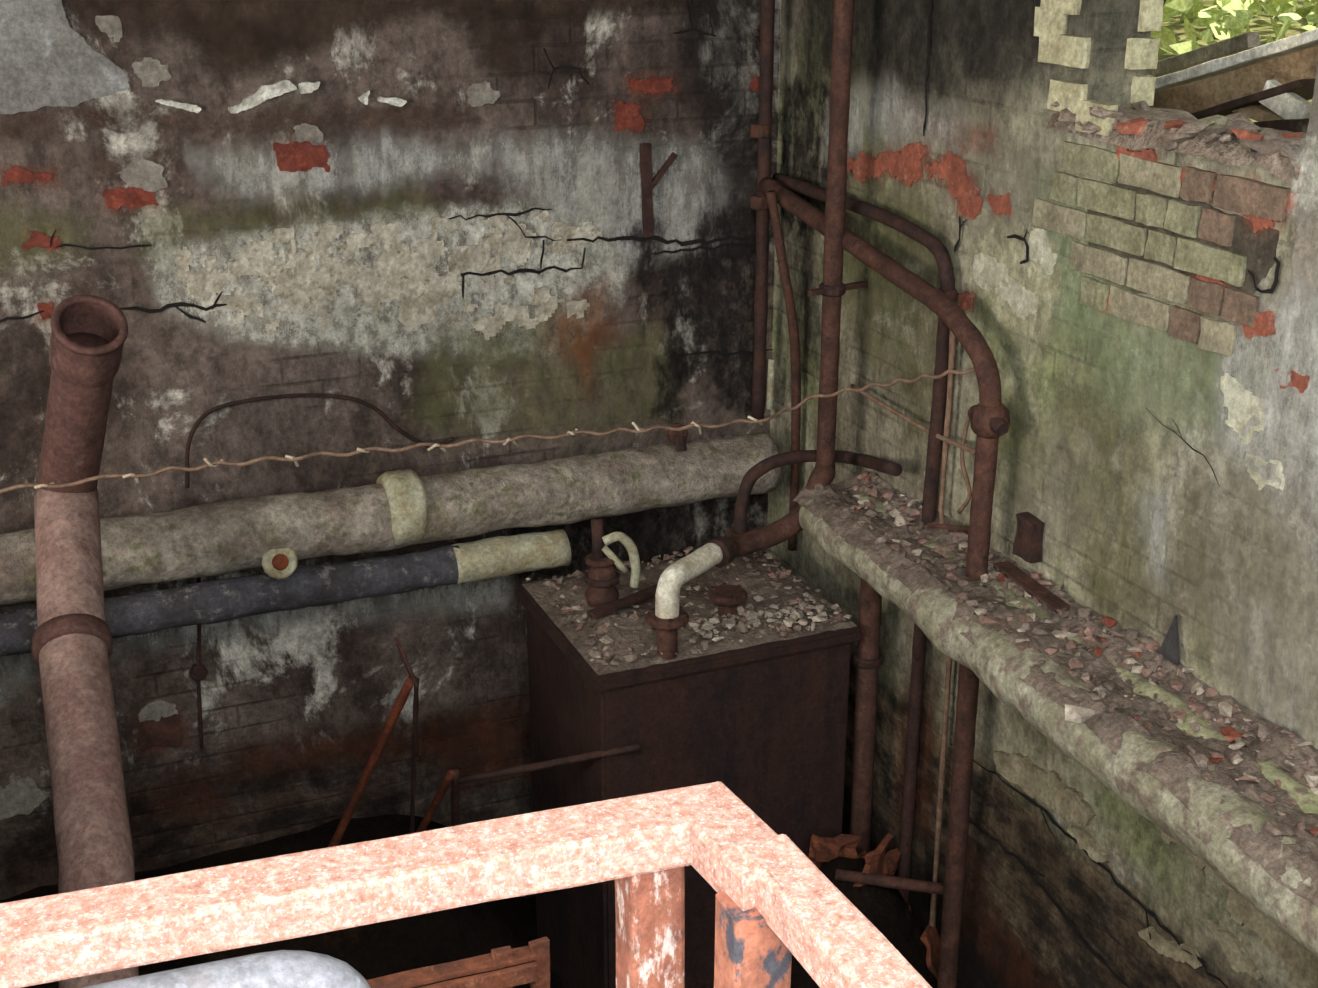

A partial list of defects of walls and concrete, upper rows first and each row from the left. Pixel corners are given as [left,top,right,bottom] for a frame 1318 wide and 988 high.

peeling [95,15,122,42]
flaking render [0,57,480,191]
flaking render [95,155,159,211]
flaking render [21,231,62,251]
leakage [152,141,756,359]
crack [449,207,756,298]
flaking render [847,106,1298,357]
crack [0,310,44,323]
crack [120,291,227,323]
peeling [1220,373,1285,491]
crack [969,759,1228,988]